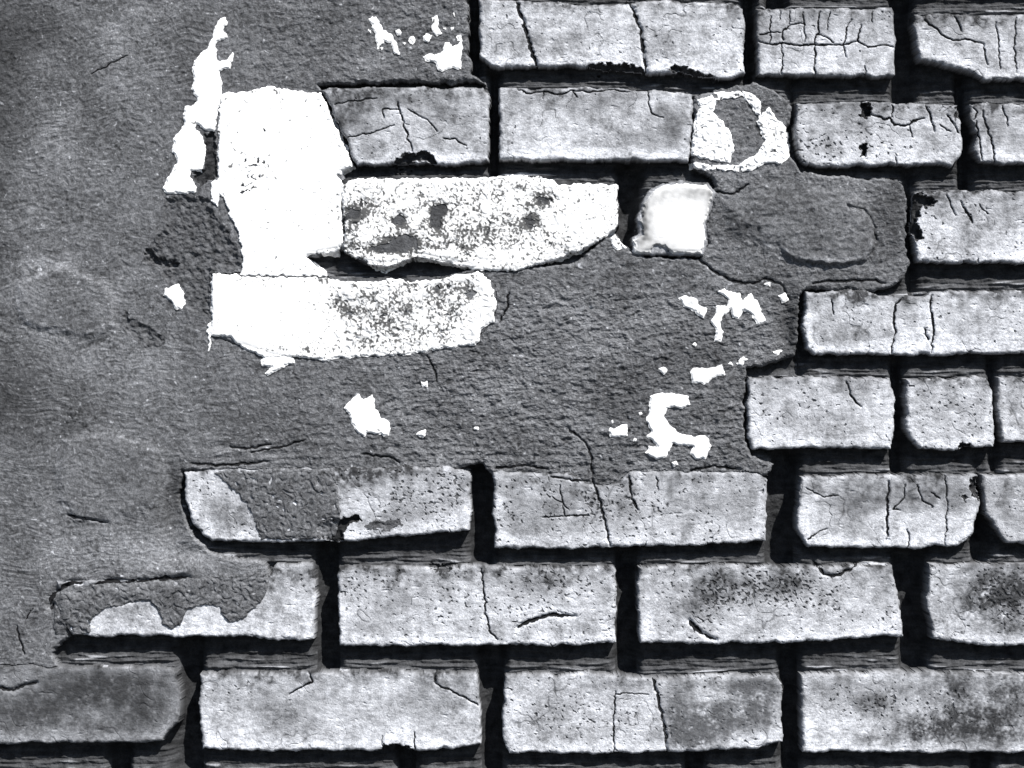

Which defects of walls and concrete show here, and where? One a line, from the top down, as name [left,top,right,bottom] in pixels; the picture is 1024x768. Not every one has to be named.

crack [758,11,894,78]
crack [924,17,1017,73]
crack [335,98,467,148]
peeling [668,64,790,172]
peeling [141,13,713,376]
peeling [678,288,766,342]
peeling [690,357,748,385]
peeling [344,394,391,437]
peeling [609,393,711,467]
crack [496,429,611,545]
crack [885,475,948,547]
crack [613,677,668,752]